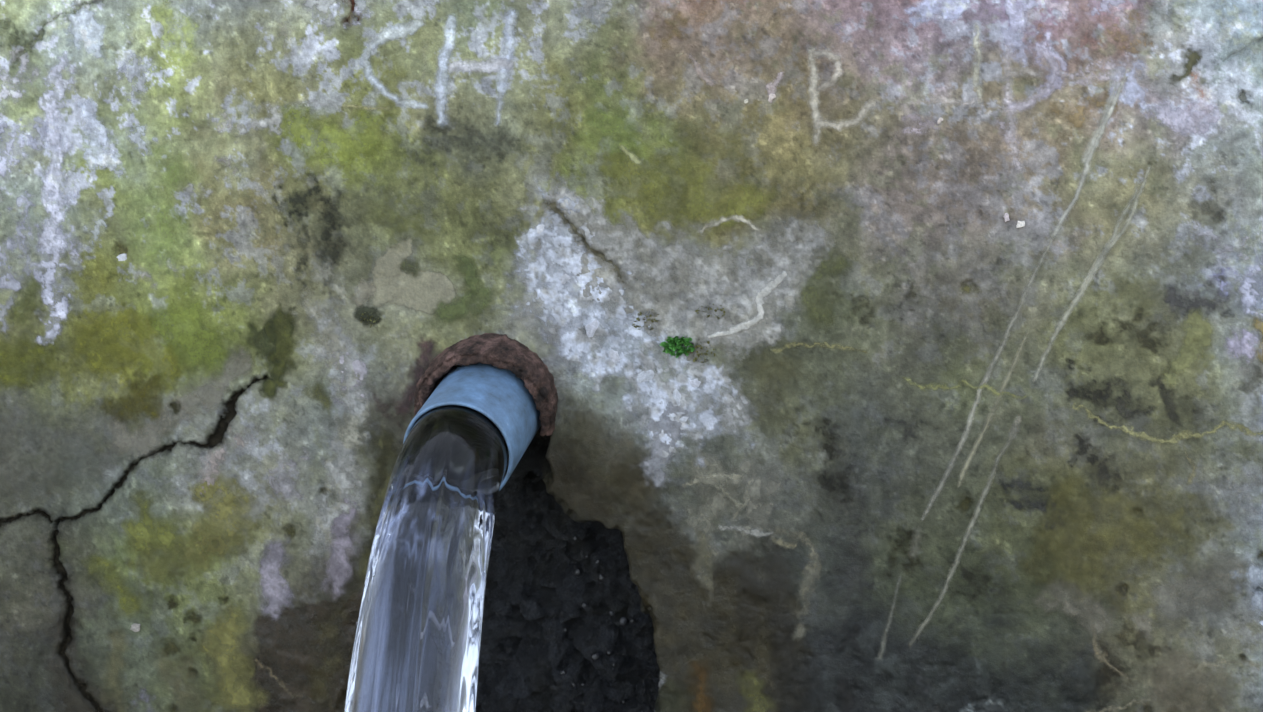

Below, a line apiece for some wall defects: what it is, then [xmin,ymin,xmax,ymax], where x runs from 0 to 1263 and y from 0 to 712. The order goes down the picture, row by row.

crack [0,375,267,712]
leakage [254,178,369,712]